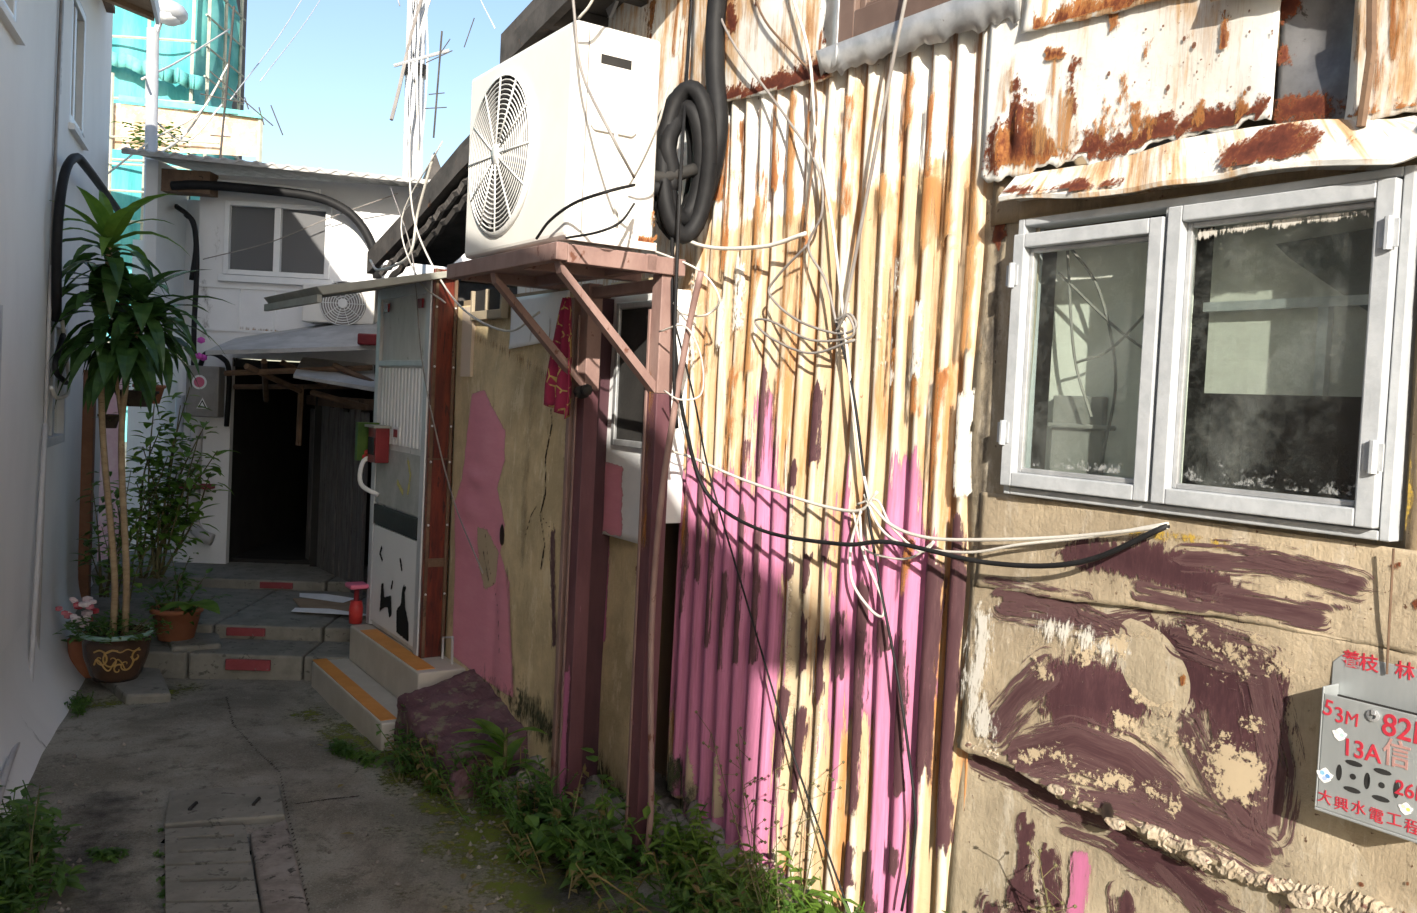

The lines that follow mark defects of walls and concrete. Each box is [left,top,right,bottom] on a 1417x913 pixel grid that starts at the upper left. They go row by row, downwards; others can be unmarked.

corrosion [879,174,905,212]
corrosion [904,0,1417,353]
corrosion [900,353,949,595]